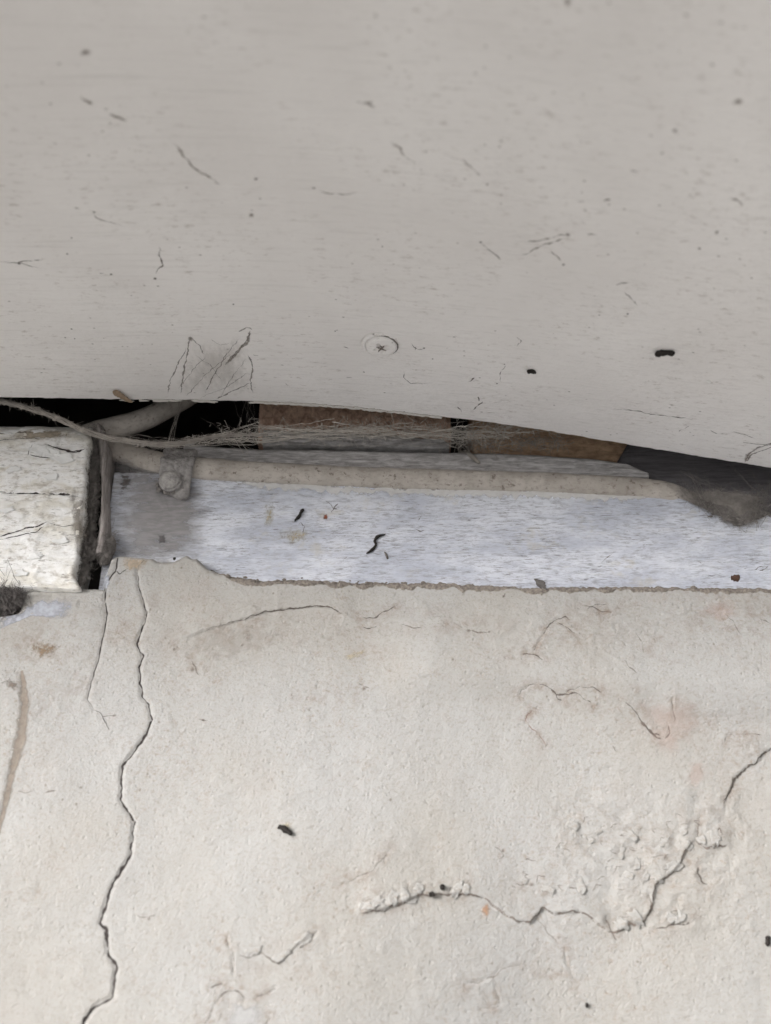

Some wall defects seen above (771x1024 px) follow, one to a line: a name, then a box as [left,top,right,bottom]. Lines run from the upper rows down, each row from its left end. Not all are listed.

crack [1,489,70,497]
crack [2,522,71,539]
crack [215,605,393,629]
crack [82,558,153,1024]
crack [512,813,699,890]